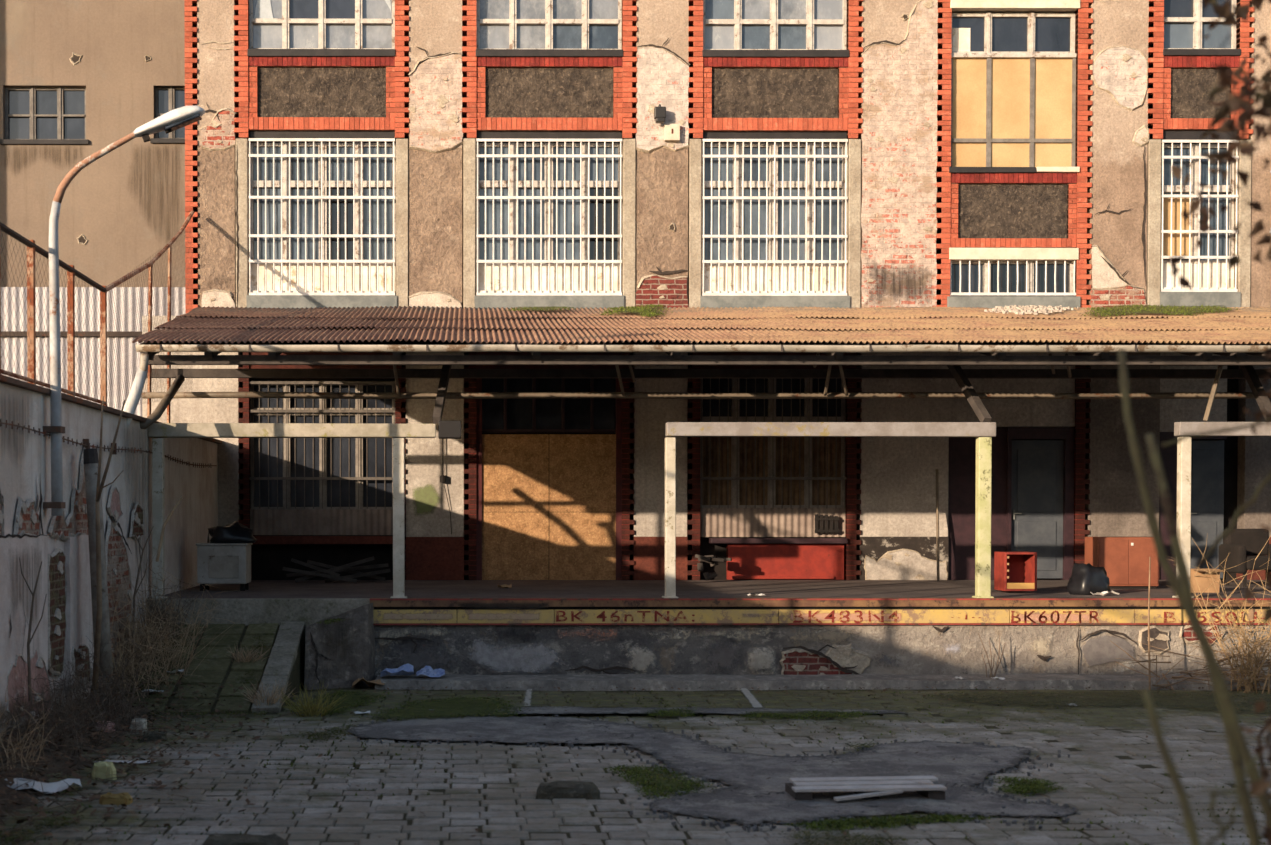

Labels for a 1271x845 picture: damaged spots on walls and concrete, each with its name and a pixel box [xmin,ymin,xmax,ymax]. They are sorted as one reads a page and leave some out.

crack [864,39,906,48]
spalling [408,52,463,153]
spalling [636,46,690,153]
spalling [200,108,236,151]
spalling [861,0,938,308]
spalling [635,274,688,308]
leakage [876,269,923,299]
spalling [1090,245,1147,308]
spalling [0,447,92,722]
peeling [864,549,948,580]
peeling [790,613,901,621]
spalling [779,644,872,675]